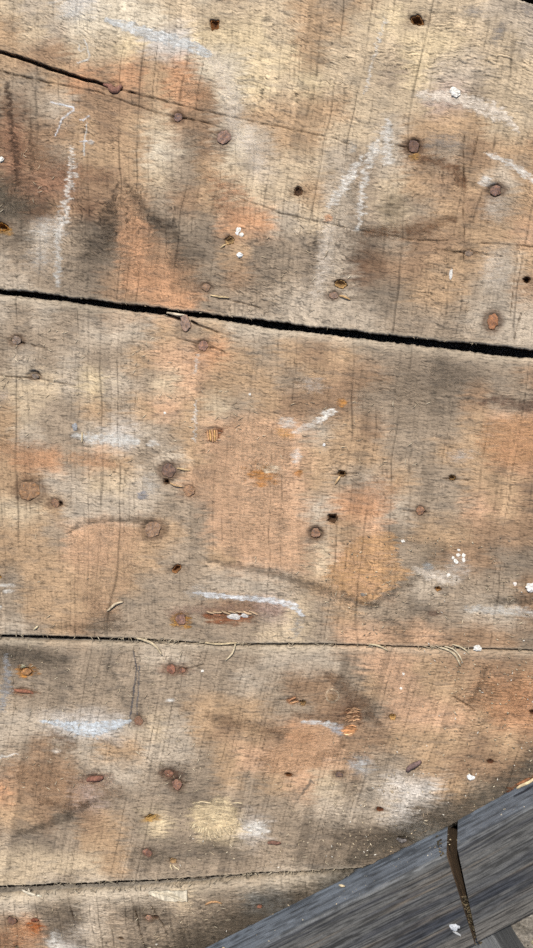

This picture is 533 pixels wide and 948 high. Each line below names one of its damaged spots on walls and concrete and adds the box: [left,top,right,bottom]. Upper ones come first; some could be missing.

crack [0,52,105,87]